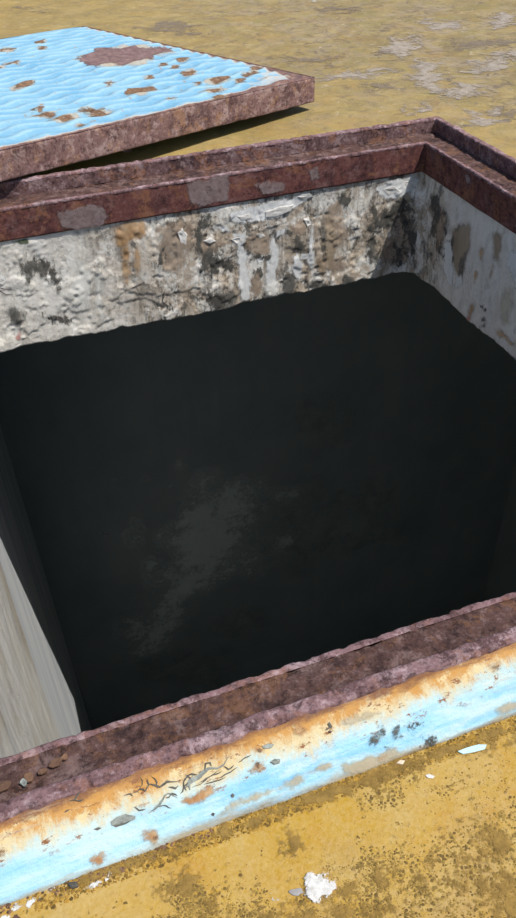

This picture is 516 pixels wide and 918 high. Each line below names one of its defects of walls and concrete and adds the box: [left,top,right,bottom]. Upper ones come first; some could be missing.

rust [11,80,35,91]
rust [76,44,262,100]
rust [31,106,113,127]
damp [194,191,354,311]
damp [366,199,417,267]
damp [429,191,470,289]
damp [13,239,104,326]
peeling [111,814,136,827]
crack [124,755,251,812]
rust [182,786,214,804]
rust [343,748,399,773]
peeling [458,744,486,754]